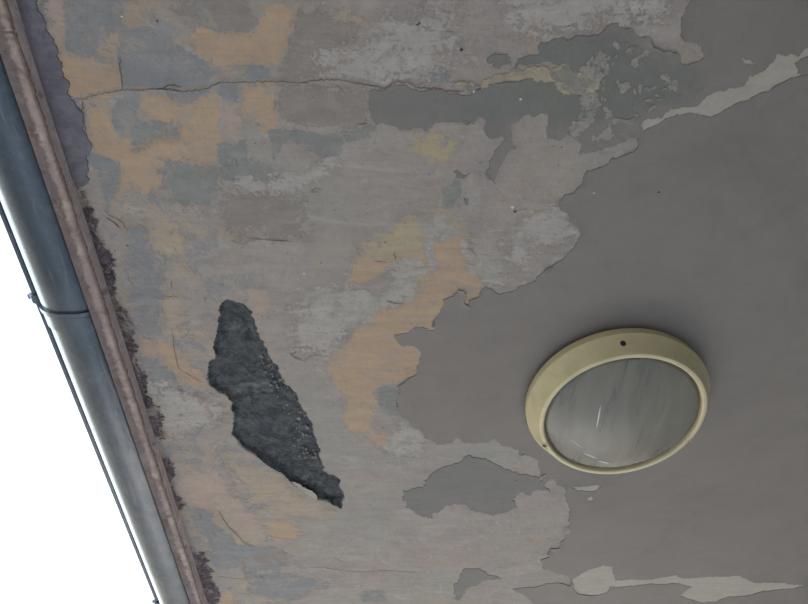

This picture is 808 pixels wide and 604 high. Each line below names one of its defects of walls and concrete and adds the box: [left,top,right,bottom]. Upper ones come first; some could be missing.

spalling [16,0,94,190]
crack [71,57,555,136]
peeling [641,48,808,131]
peeling [59,0,704,604]
peeling [573,565,802,603]